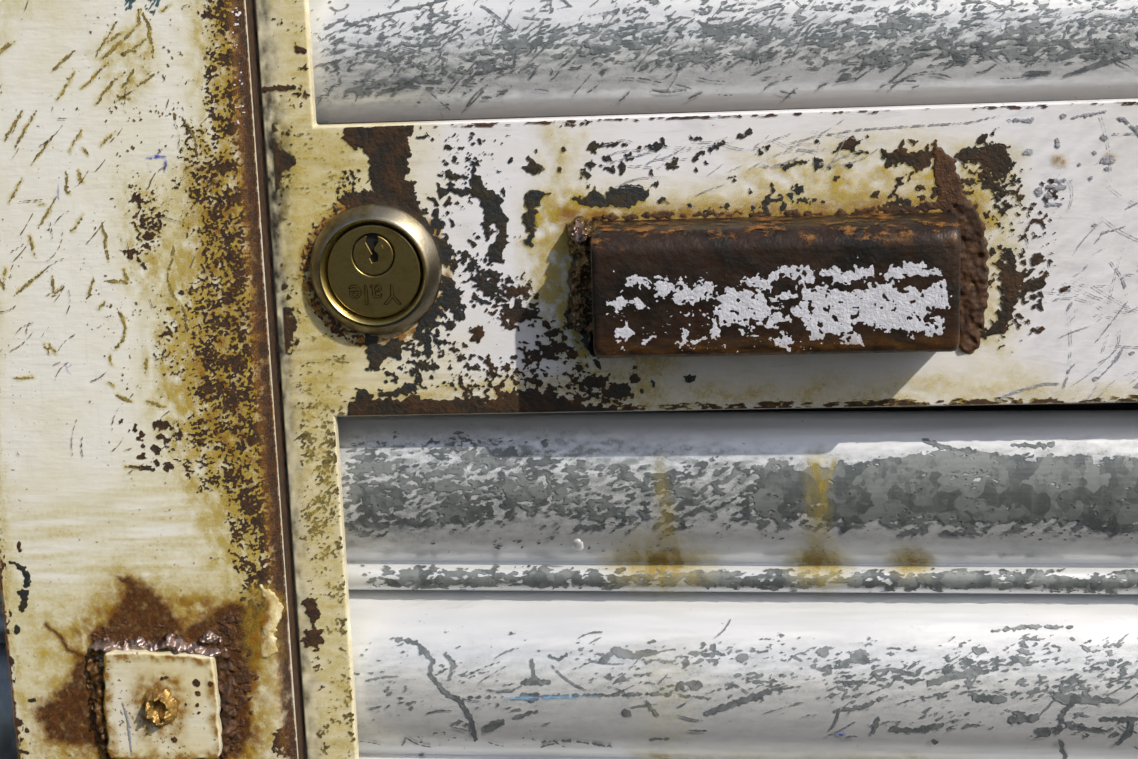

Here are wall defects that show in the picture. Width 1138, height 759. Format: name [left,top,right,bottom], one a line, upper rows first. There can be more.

peeling [272,0,1138,108]
peeling [525,113,777,210]
spalling [119,0,288,658]
corrosion [9,0,416,759]
peeling [333,122,551,399]
corrosion [290,126,1071,421]
peeling [606,257,952,352]
corrosion [0,550,13,662]
corrosion [631,548,685,578]
peeling [291,374,1138,608]
corrosion [801,545,838,574]
peeling [309,618,1138,759]